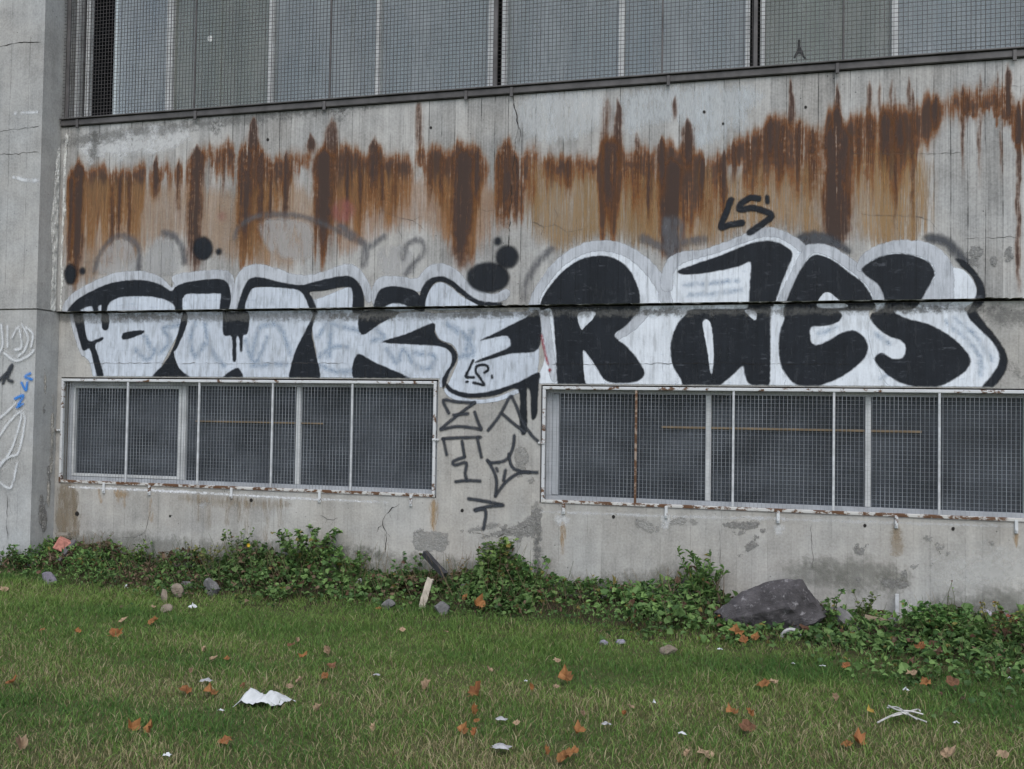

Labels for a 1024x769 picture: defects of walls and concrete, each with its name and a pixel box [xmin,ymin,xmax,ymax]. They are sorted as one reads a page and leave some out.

crack [507,97,580,246]
corrosion [66,67,1024,285]